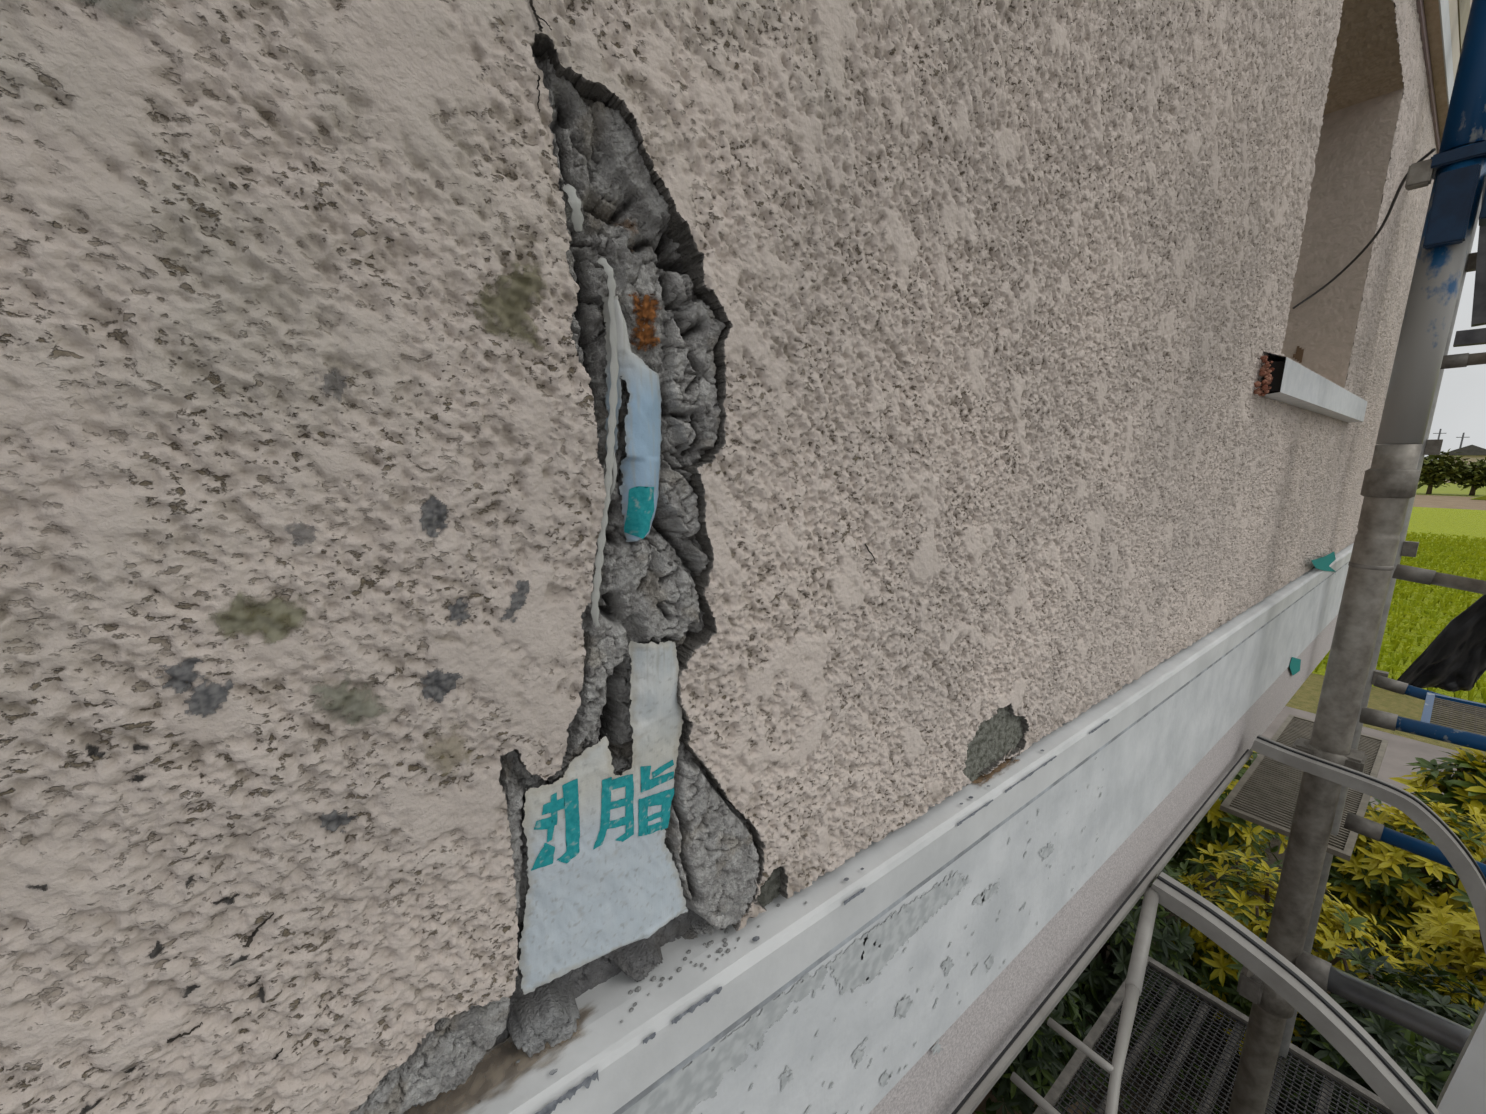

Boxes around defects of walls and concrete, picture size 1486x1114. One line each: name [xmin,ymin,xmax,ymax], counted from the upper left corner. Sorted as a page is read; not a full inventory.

crack [529,0,552,32]
crack [534,75,542,112]
corrosion [628,292,660,352]
flaking render [323,370,346,401]
corrosion [1253,355,1275,397]
flaking render [287,523,316,545]
spalling [349,33,788,1114]
spalling [960,703,1045,805]
flaking render [319,809,358,833]
spalling [213,894,240,905]
peeling [622,871,1006,1114]